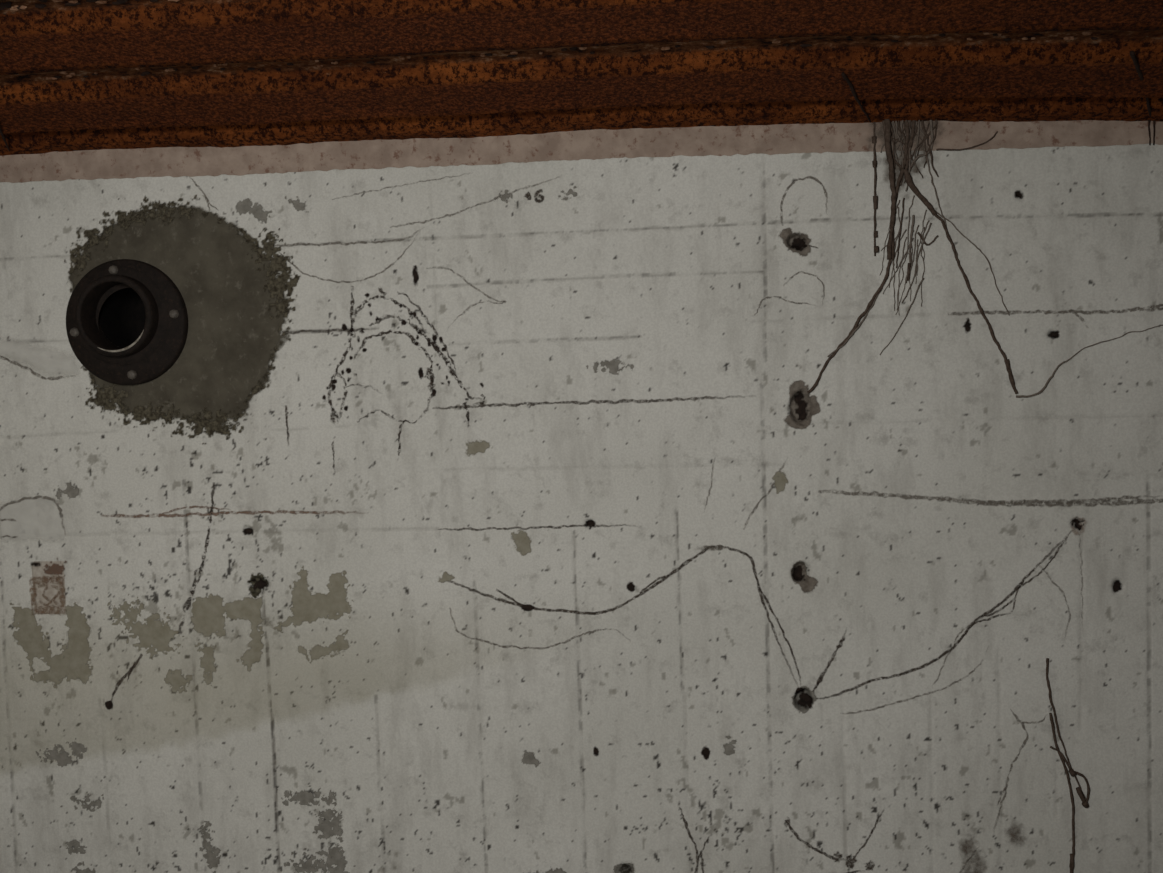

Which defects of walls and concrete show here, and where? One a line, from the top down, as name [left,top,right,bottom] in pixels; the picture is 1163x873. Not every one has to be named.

crack [780,176,827,221]
crack [284,327,361,335]
crack [757,272,825,313]
crack [953,304,1163,321]
peeling [10,603,93,688]
peeling [107,567,353,693]
crack [451,538,1071,714]
crack [998,713,1045,815]
peeling [61,794,104,812]
peeling [65,838,95,873]
peeling [200,821,221,873]
peeling [277,786,355,873]